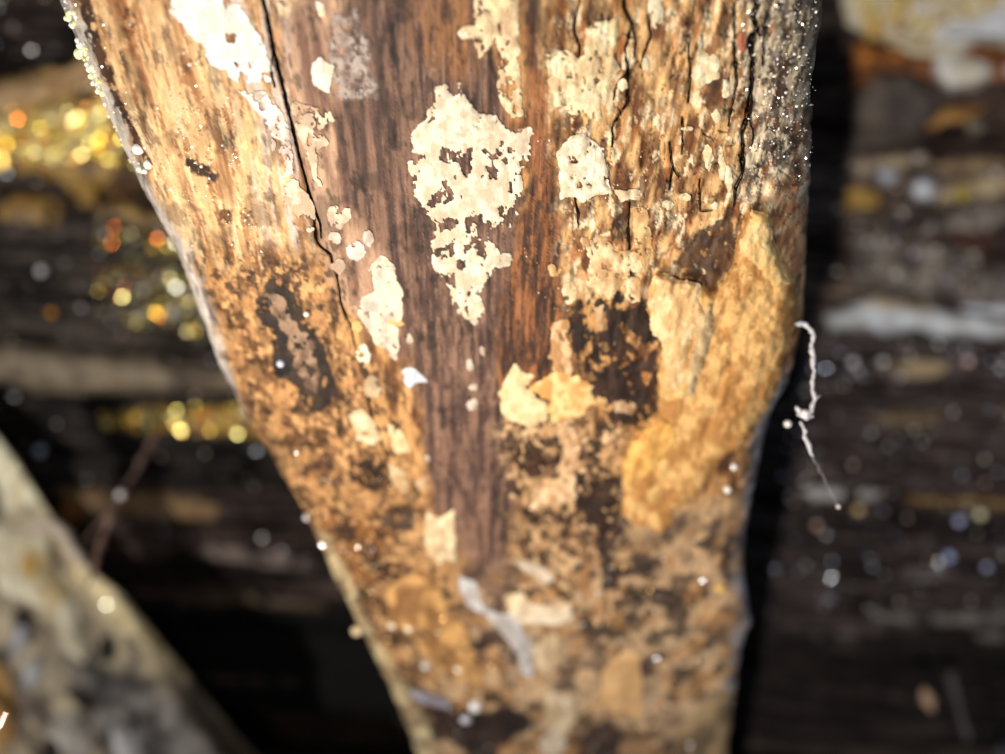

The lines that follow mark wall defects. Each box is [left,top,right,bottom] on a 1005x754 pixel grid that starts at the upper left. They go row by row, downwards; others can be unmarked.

peeling [170,0,335,232]
crack [262,0,356,350]
peeling [311,1,377,100]
crack [572,0,581,69]
peeling [556,134,653,269]
crack [625,202,633,277]
crack [611,0,652,147]
crack [668,41,710,212]
peeling [702,144,733,193]
crack [728,0,764,206]
peeling [498,319,636,510]
peeling [619,208,798,533]